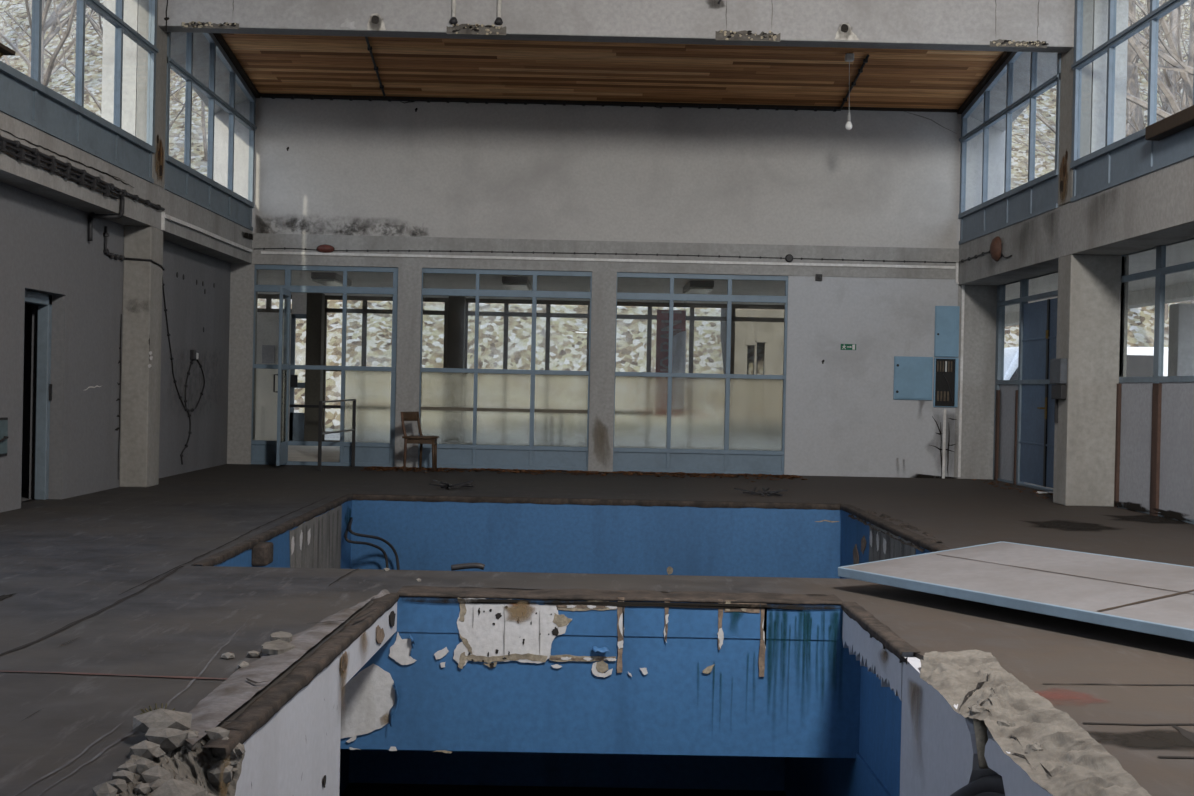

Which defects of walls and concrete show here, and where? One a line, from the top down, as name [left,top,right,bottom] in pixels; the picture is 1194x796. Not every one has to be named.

spalling [235,585,1053,796]
damp [769,612,843,668]